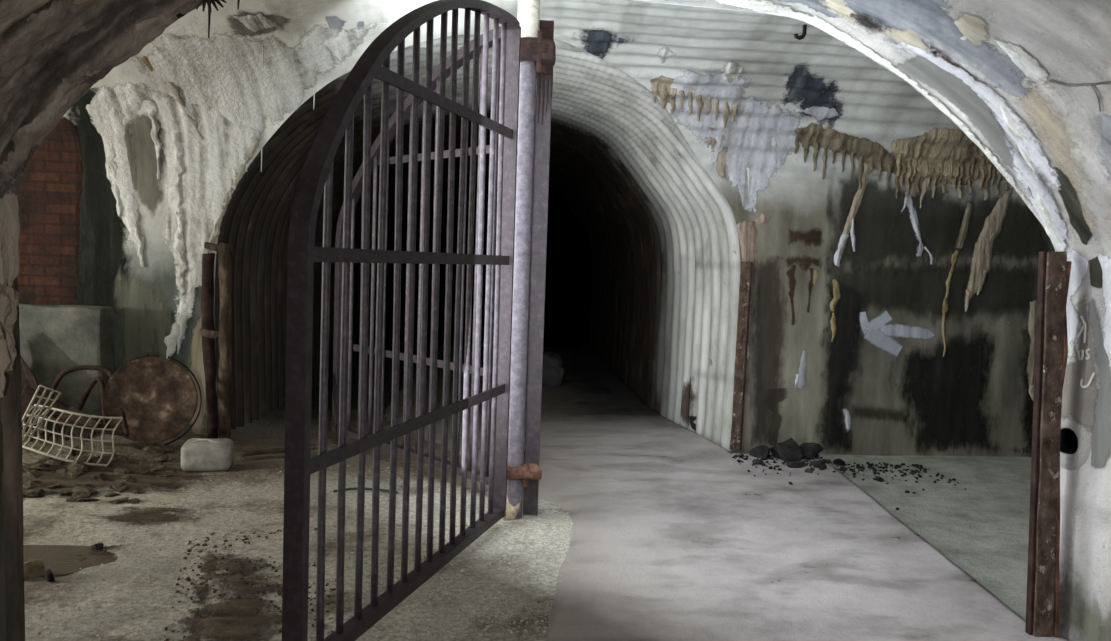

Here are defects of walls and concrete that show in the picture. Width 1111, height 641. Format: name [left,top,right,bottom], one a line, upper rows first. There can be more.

water stain [86,13,376,436]
peeling [227,12,288,36]
peeling [326,16,364,30]
water stain [670,61,843,213]
water stain [716,0,1093,454]
peeling [778,0,1049,171]
peeling [1060,250,1098,471]
water stain [1089,253,1111,468]